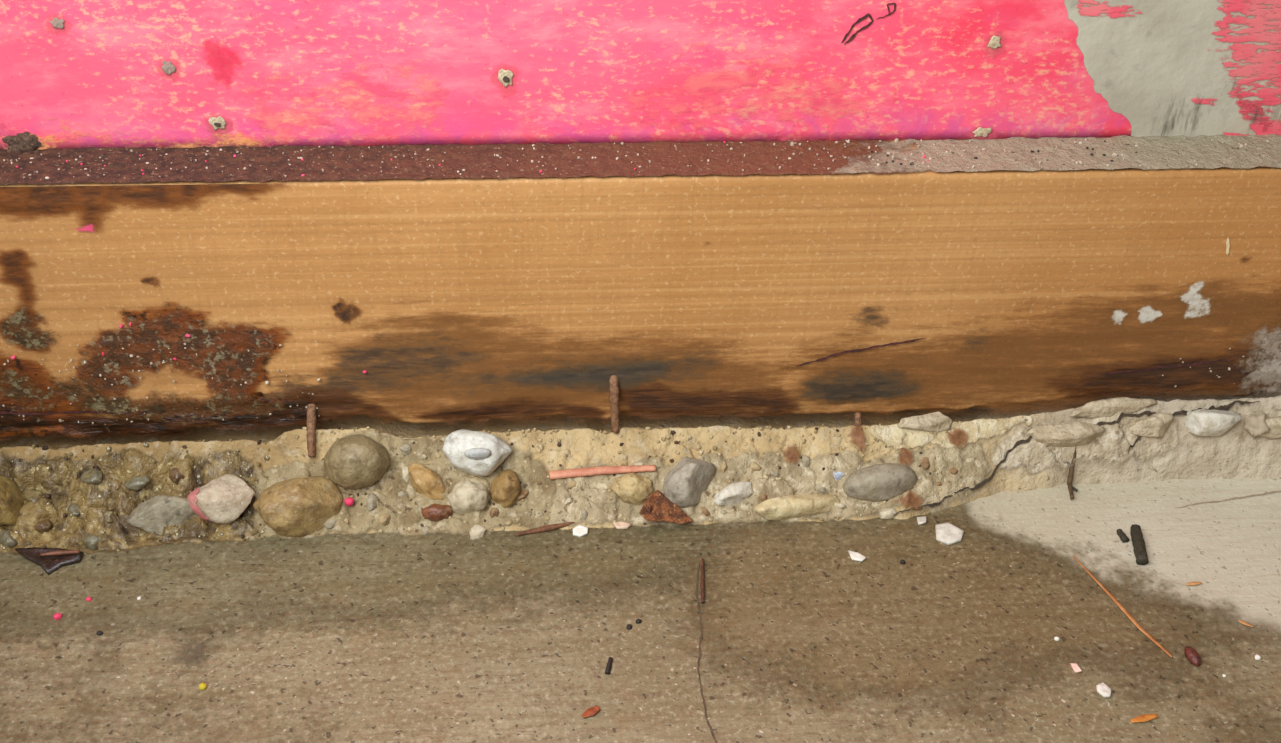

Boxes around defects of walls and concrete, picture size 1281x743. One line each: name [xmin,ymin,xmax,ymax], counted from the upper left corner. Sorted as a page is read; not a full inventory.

peeling [1064,0,1281,137]
damp [0,183,282,231]
damp [0,250,1281,439]
crack [1097,390,1267,453]
crack [894,435,1032,515]
crack [1174,491,1281,508]
damp [0,503,1281,743]